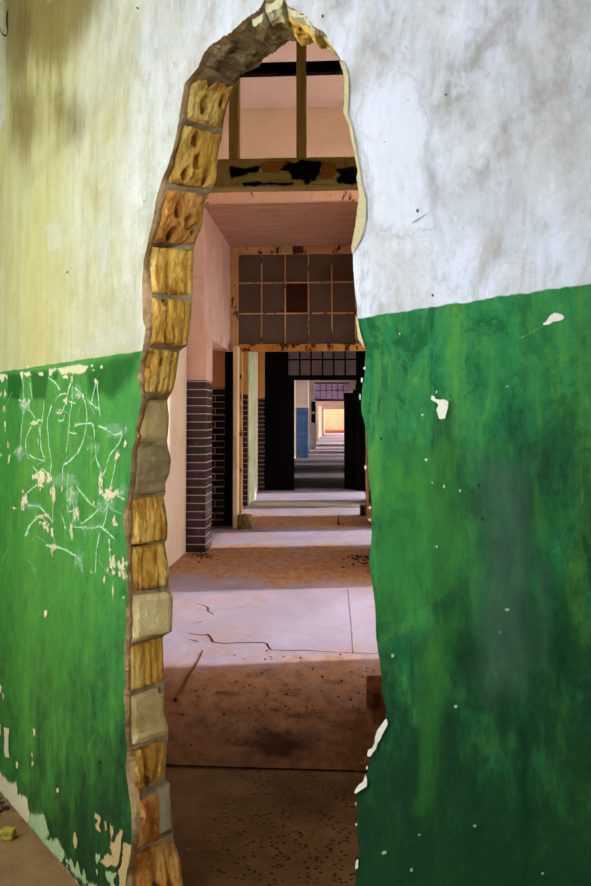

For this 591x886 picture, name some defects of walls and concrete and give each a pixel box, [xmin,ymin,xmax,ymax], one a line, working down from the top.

spalling [228,61,366,253]
peeling [543,313,564,325]
peeling [20,364,103,384]
peeling [431,390,448,419]
peeling [32,471,79,539]
peeling [93,472,123,504]
peeling [36,513,57,556]
peeling [103,548,128,599]
crack [189,603,350,653]
peeling [0,725,18,769]
spalling [355,719,388,805]
peeling [0,772,131,886]